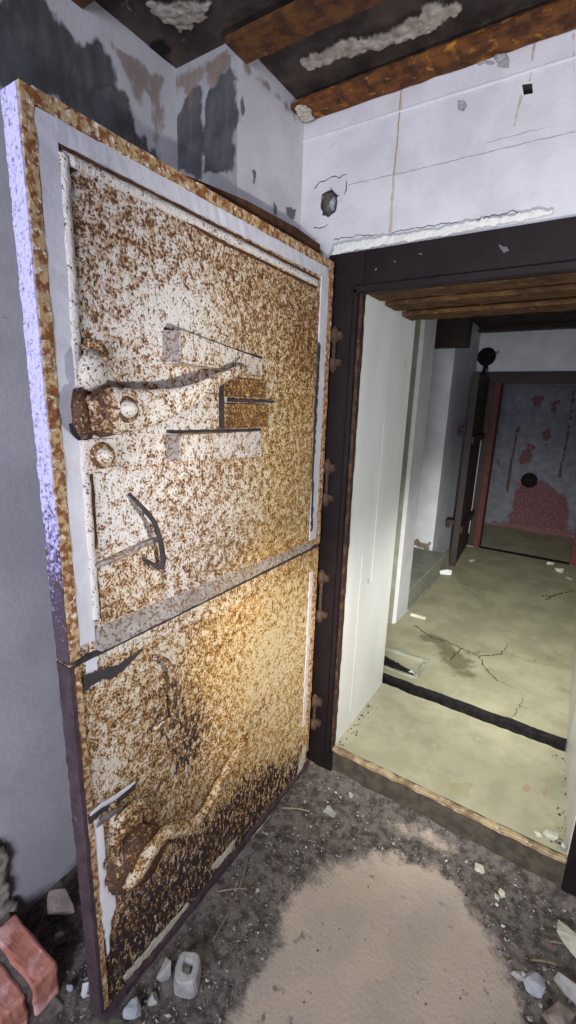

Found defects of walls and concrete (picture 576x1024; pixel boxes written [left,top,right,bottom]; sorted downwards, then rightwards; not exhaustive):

rust [392,89,402,188]
hole [314,174,347,229]
peeling [484,480,573,538]
crack [414,625,550,718]